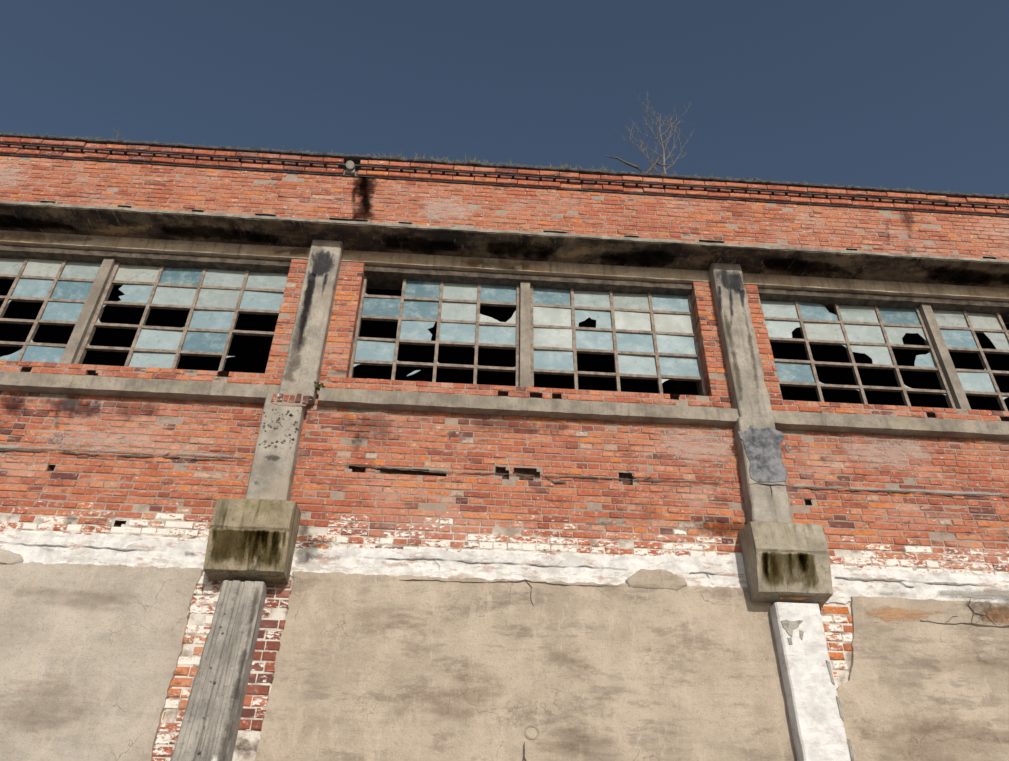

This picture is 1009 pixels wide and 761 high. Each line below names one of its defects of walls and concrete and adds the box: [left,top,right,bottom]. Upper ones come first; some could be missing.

water stain [353,171,375,219]
water stain [300,273,327,340]
water stain [719,287,744,315]
spalling [349,465,447,477]
crack [370,557,628,606]
crack [835,577,1009,627]
spalling [152,576,226,761]
spalling [238,579,293,731]
peeling [781,620,804,645]
spalling [819,606,853,721]